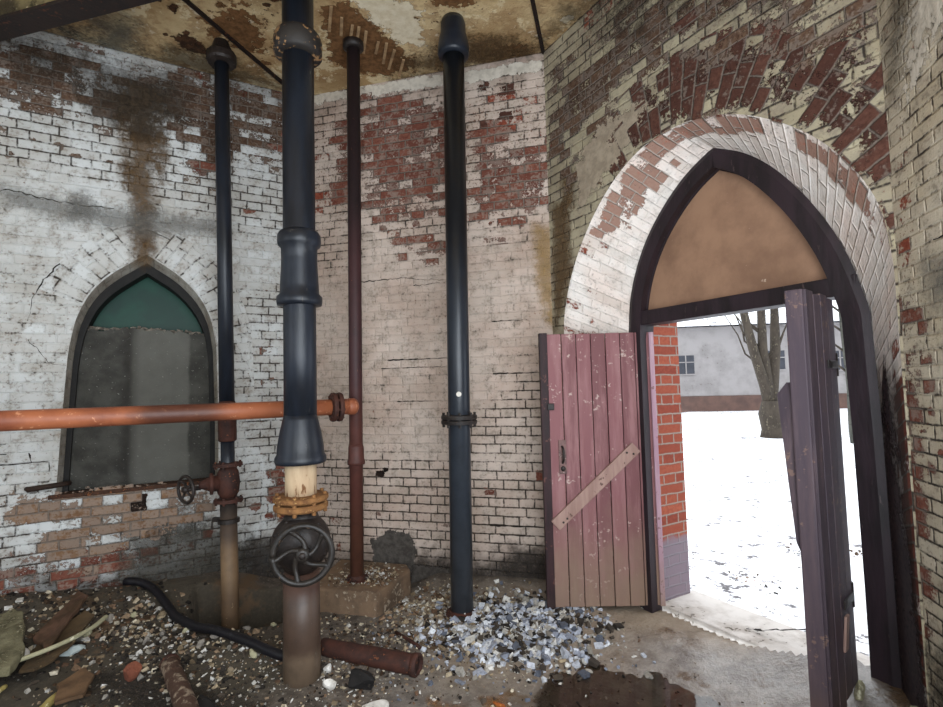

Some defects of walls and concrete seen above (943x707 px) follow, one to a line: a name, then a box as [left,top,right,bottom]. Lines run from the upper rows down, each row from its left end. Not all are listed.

peeling [163,0,282,65]
crack [1,189,114,209]
peeling [0,37,216,192]
damp [82,71,182,264]
peeling [229,81,282,177]
peeling [314,90,347,106]
peeling [319,0,477,267]
peeling [464,0,895,247]
peeling [0,481,217,595]
peeling [248,453,285,529]